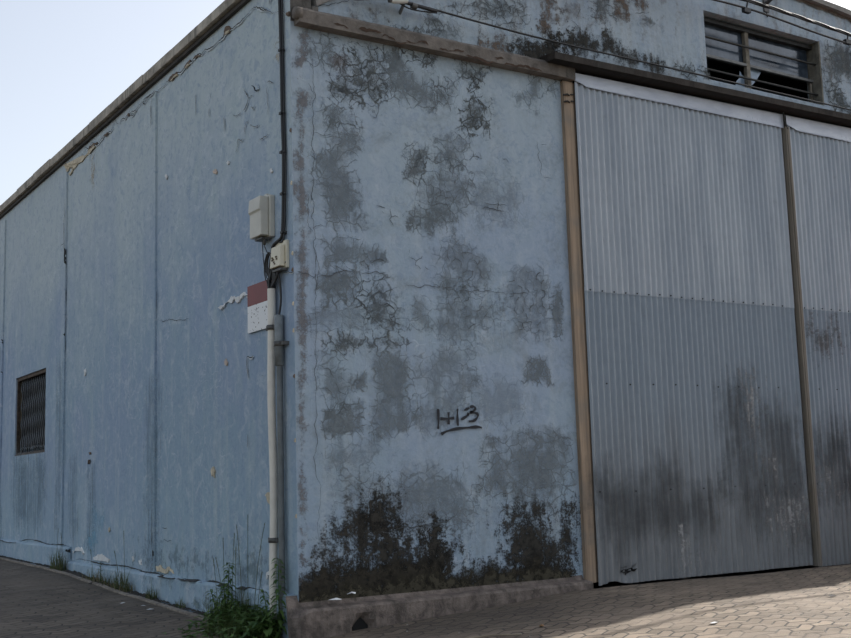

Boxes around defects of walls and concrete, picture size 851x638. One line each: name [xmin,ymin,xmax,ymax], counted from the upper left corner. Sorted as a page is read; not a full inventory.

crack [318,0,541,71]
mould [448,0,710,82]
damp [823,40,851,114]
peeling [63,132,109,176]
damp [305,34,491,439]
crack [298,60,549,566]
damp [551,289,564,337]
damp [299,429,581,603]
peeling [72,547,110,563]